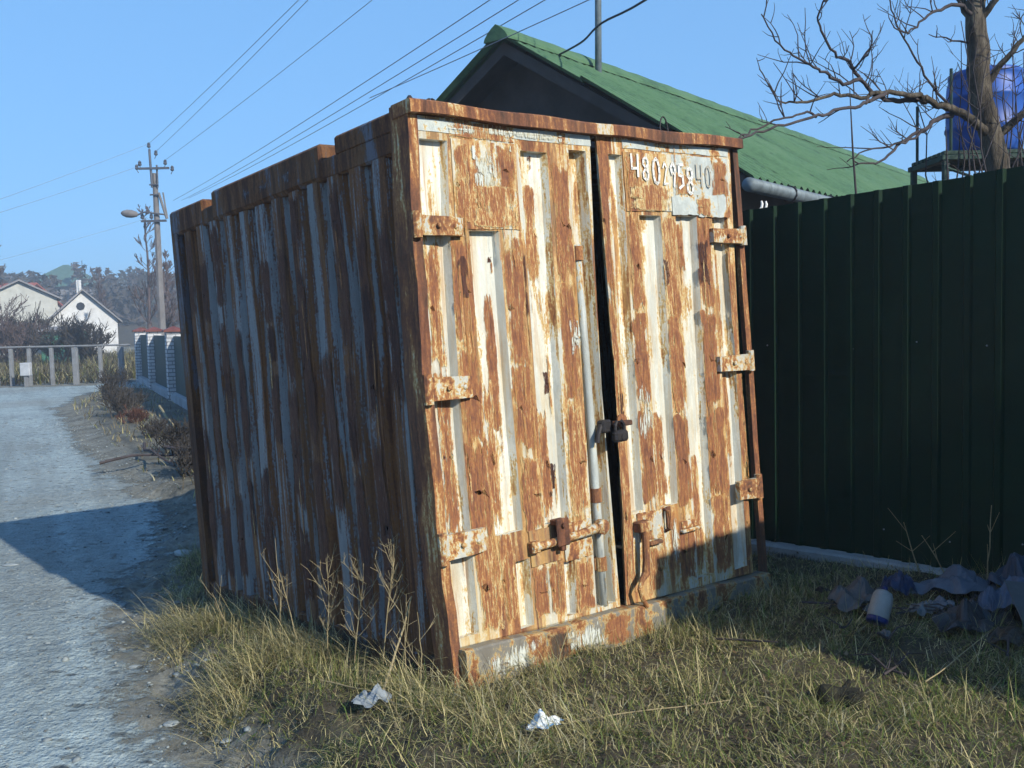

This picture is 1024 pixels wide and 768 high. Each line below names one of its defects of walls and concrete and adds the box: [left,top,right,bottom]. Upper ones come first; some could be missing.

peeling [438,123,578,188]
corrosion [199,226,278,587]
corrosion [260,259,332,600]
corrosion [329,180,395,617]
corrosion [424,121,558,632]
corrosion [533,561,566,619]
corrosion [550,163,589,521]
peeling [570,320,581,353]
corrosion [576,556,596,612]
peeling [639,386,654,437]
corrosion [598,140,749,593]
corrosion [744,499,753,564]